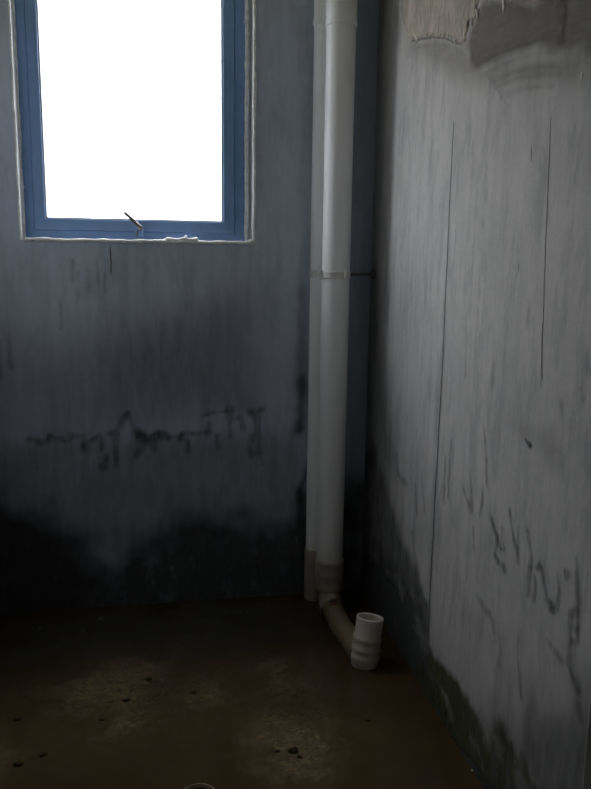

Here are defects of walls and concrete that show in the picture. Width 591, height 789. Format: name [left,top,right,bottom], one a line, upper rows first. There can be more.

flaking render [403,0,483,45]
crack [443,127,454,340]
water stain [0,487,306,614]
water stain [342,448,447,717]
crack [427,360,443,647]